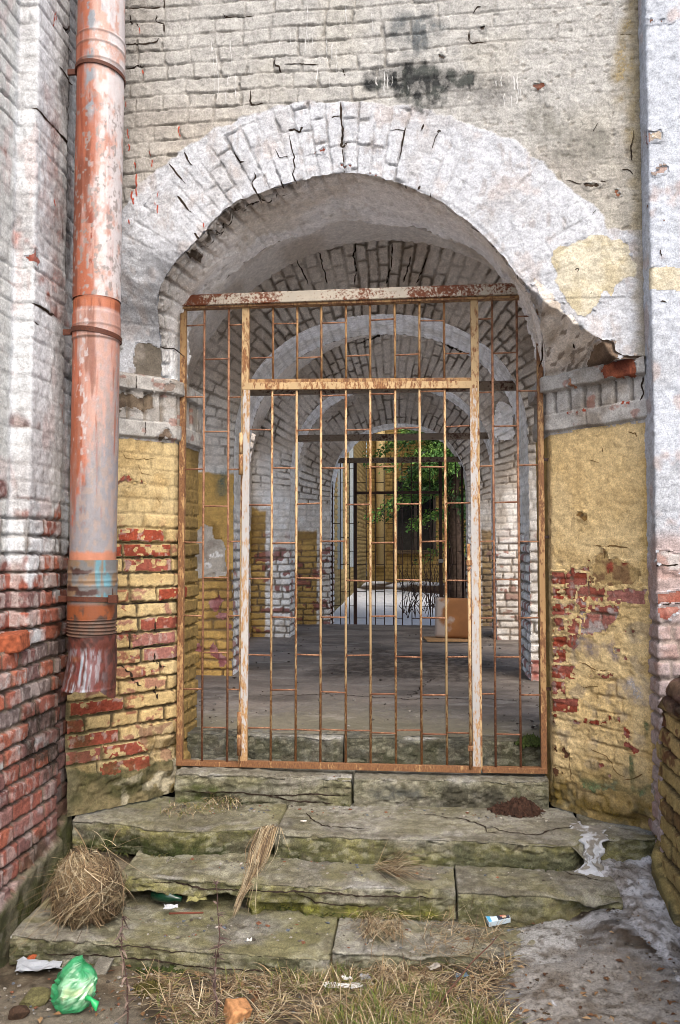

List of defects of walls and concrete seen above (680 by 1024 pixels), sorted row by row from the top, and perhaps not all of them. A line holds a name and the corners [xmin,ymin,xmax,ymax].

damp [364,61,521,113]
crack [332,102,347,172]
crack [169,127,303,253]
crack [297,253,328,284]
crack [350,244,358,284]
crack [386,244,427,283]
peeling [531,235,646,392]
peeling [116,528,171,572]
peeling [158,586,187,601]
peeling [116,616,177,680]
peeling [530,545,680,757]
crack [416,813,574,835]